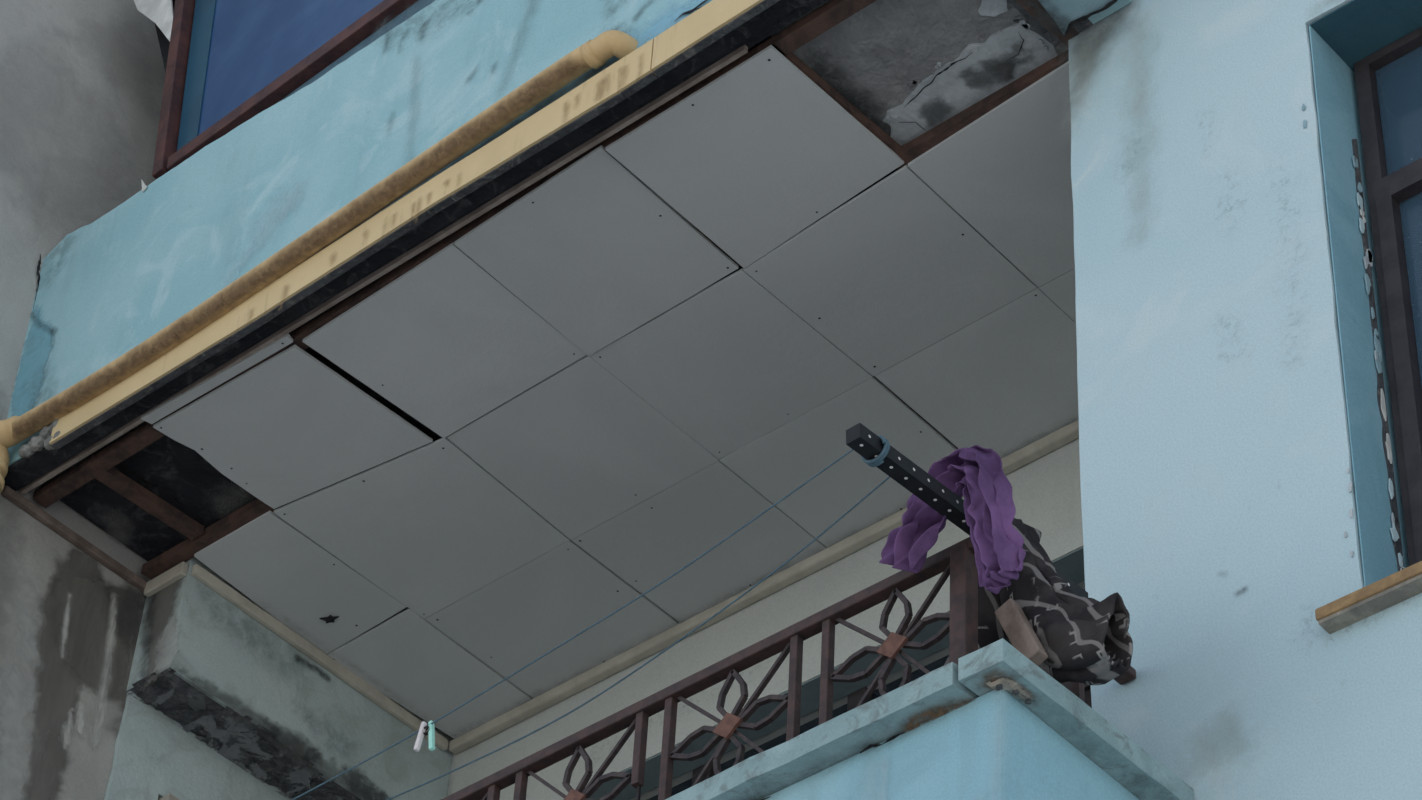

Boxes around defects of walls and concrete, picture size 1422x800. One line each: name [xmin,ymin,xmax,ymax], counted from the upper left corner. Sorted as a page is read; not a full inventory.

flaking render [882,0,1060,146]
leakage [960,58,1026,87]
leakage [4,0,809,491]
leakage [26,548,145,800]
spalling [126,580,389,800]